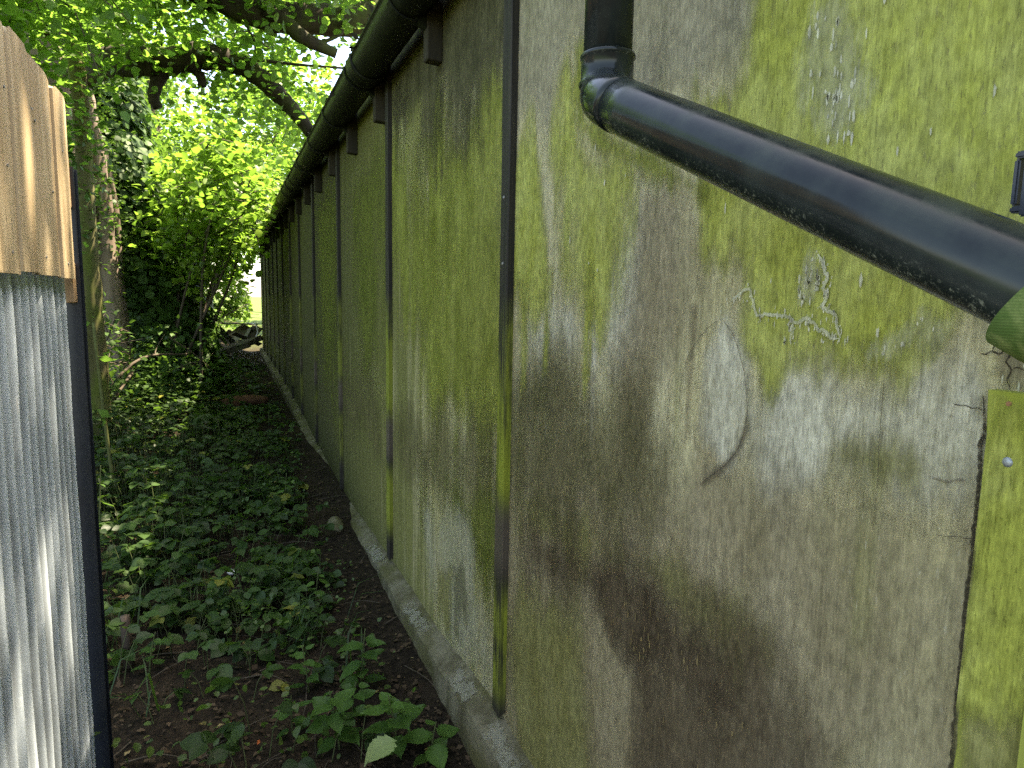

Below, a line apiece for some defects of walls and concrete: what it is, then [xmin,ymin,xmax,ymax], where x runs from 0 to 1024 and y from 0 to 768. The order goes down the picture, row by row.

water stain [392,0,504,149]
water stain [518,0,585,117]
water stain [632,0,750,86]
crack [680,318,748,485]
crack [980,346,1023,388]
water stain [483,191,985,768]